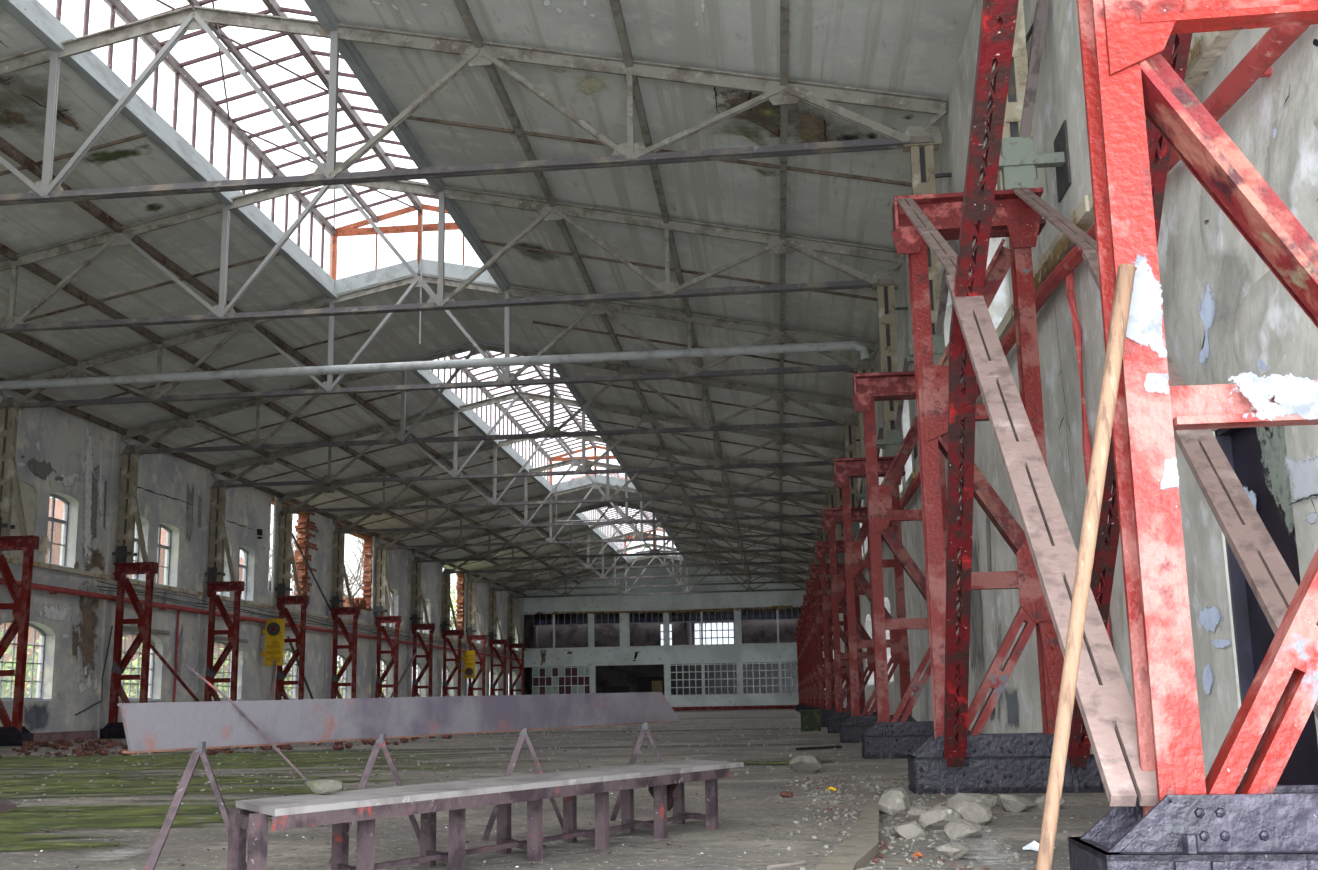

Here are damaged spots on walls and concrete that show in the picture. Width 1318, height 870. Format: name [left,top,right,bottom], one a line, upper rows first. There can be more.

crack [0,41,76,127]
water stain [0,78,81,131]
water stain [716,89,876,143]
water stain [86,146,147,164]
water stain [520,245,555,261]
peeling [1256,426,1318,547]
flaking render [271,498,319,596]
flaking render [335,523,373,611]
peeling [1196,605,1231,648]
peeling [1201,663,1214,694]